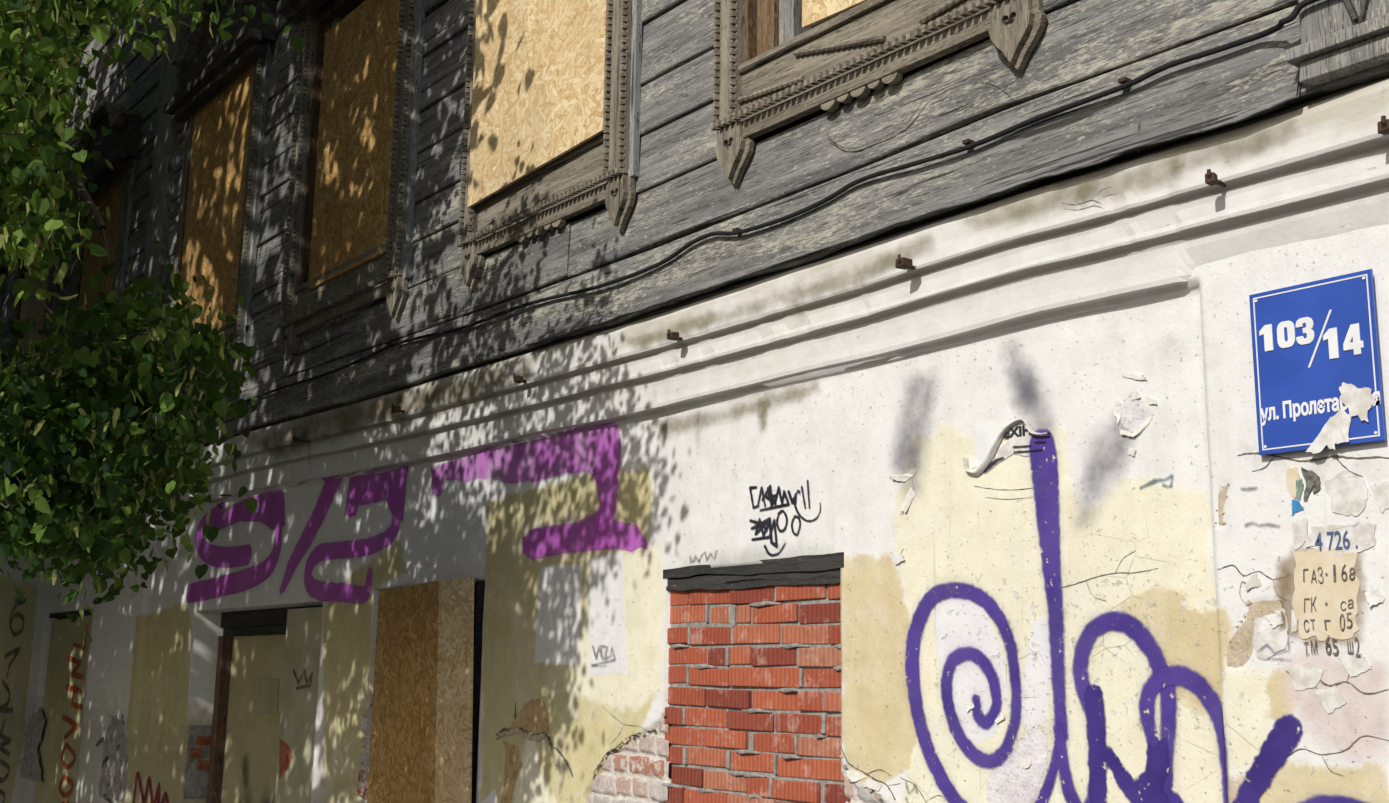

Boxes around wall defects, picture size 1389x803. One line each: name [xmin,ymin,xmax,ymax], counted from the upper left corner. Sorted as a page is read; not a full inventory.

flaking render [1214,483,1229,526]
peeling [1305,532,1319,547]
flaking render [1226,573,1284,668]
spalling [98,714,132,802]
spalling [184,725,212,799]
spalling [354,704,372,803]
flaking render [501,699,550,803]
spalling [586,713,672,803]
spalling [839,754,899,803]